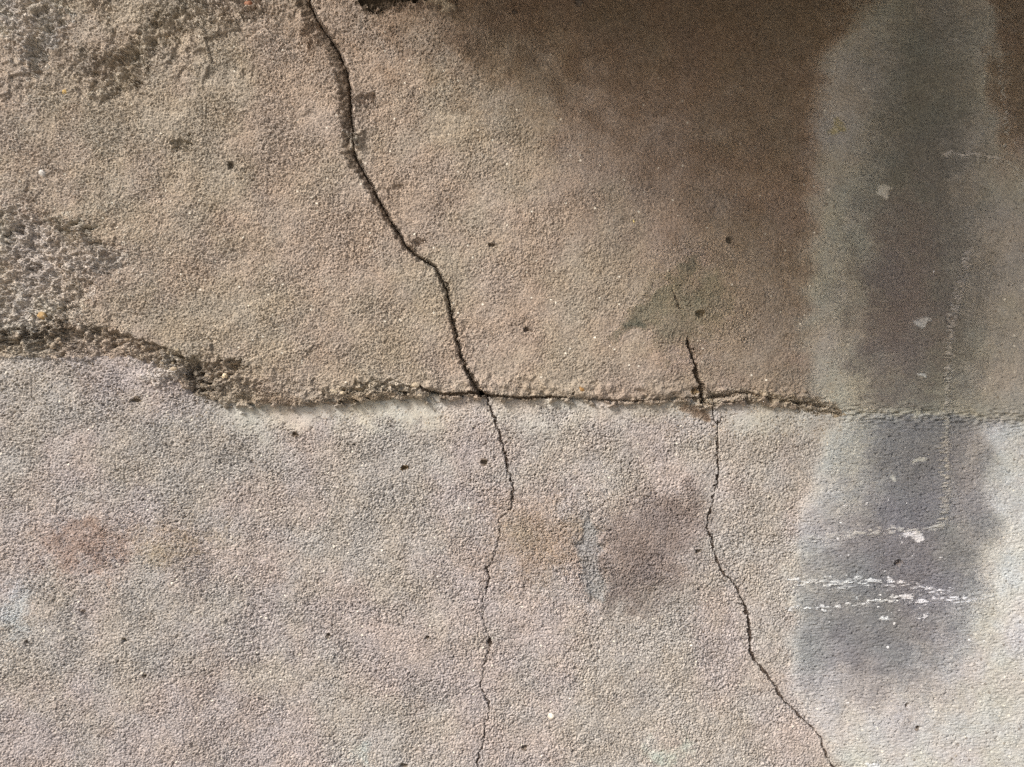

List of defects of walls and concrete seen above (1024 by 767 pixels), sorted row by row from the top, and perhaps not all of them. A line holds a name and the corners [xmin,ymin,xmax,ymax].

crack [281,0,834,767]
water stain [438,0,870,200]
water stain [613,254,732,347]
water stain [785,0,1024,707]